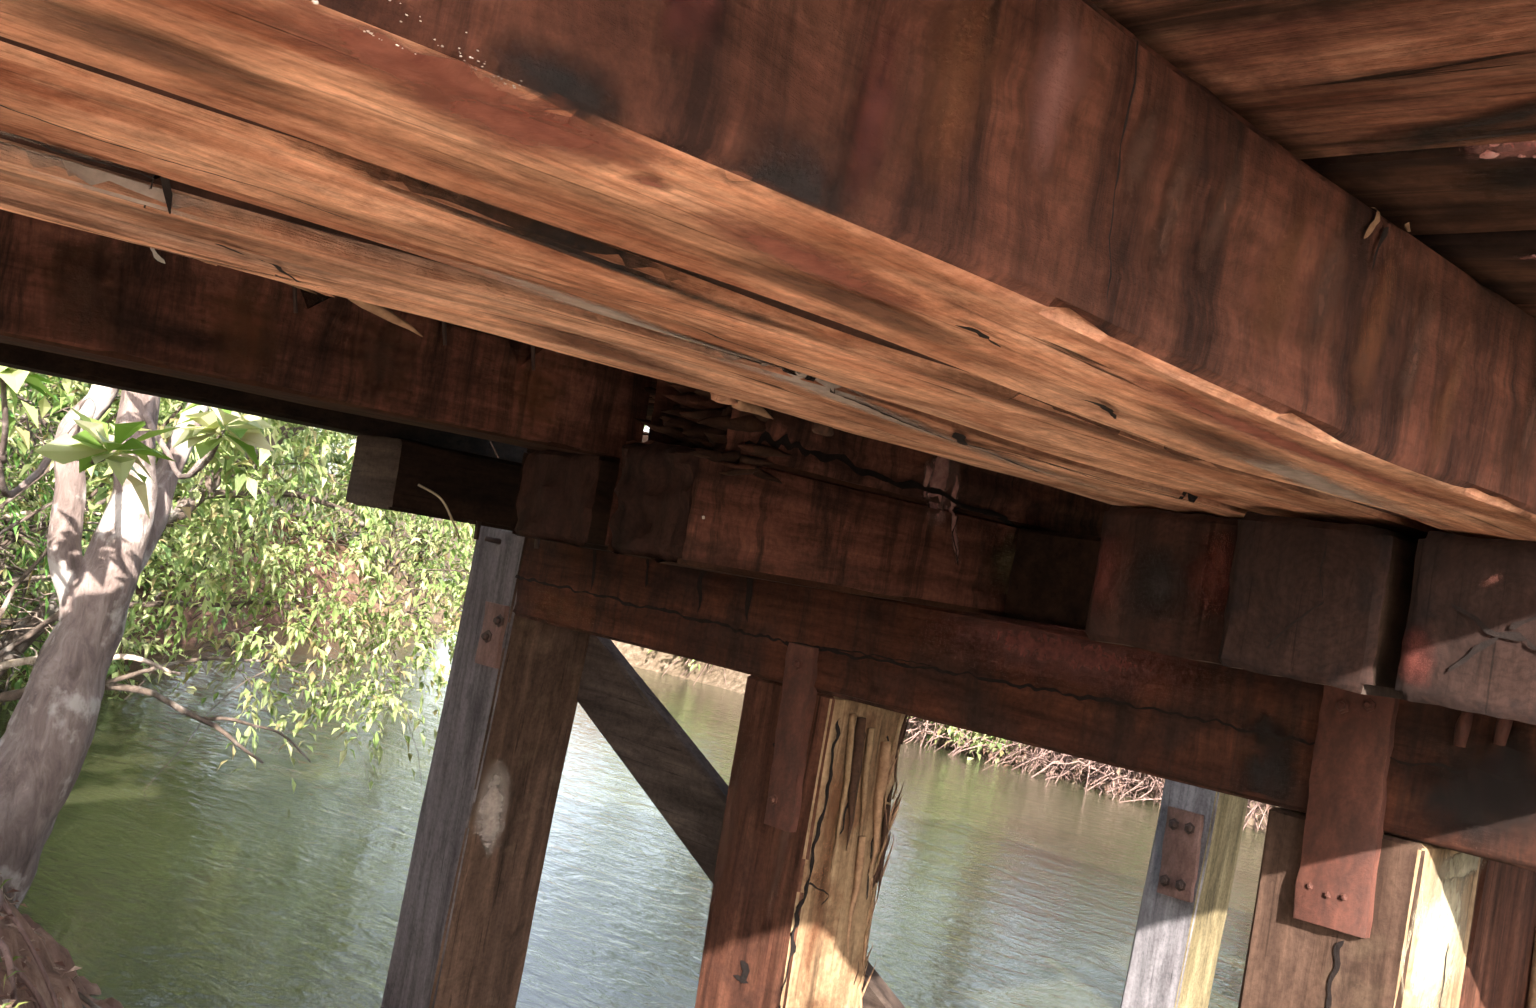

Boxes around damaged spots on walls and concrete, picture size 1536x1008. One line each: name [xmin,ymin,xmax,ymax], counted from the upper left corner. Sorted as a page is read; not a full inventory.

crack [1107,39,1139,298]
leakage [1384,104,1536,191]
crack [0,105,1198,564]
crack [515,549,1315,745]
crack [779,720,889,1008]